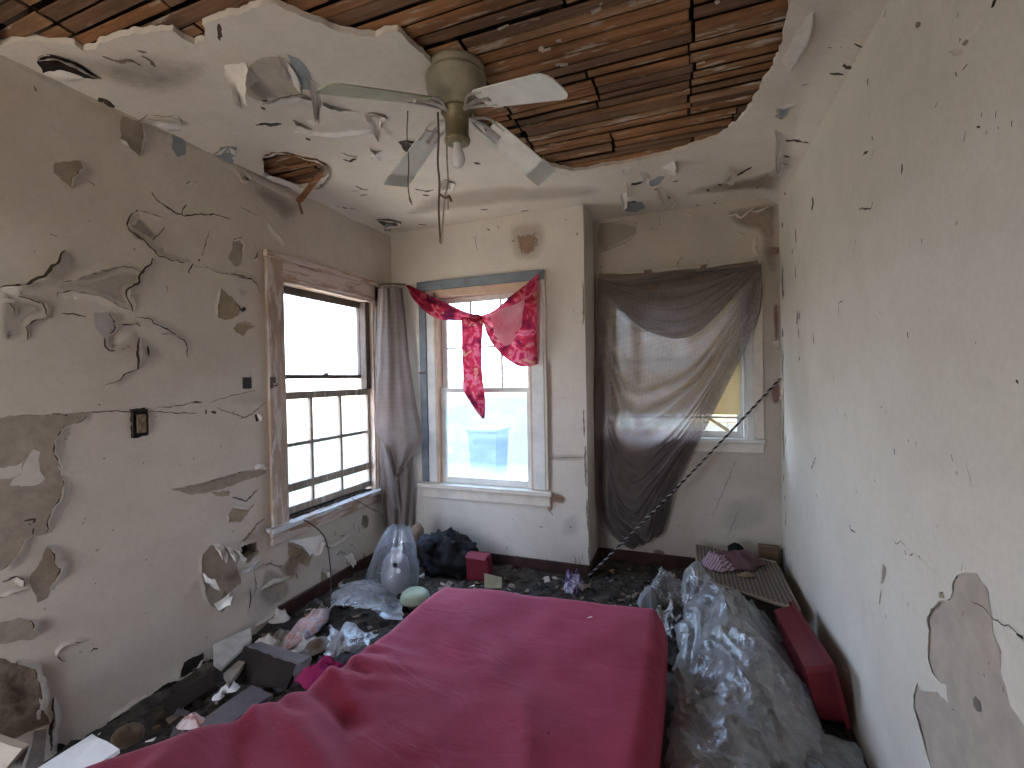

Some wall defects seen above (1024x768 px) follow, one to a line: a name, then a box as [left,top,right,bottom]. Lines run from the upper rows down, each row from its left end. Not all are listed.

flaking render [37,54,101,81]
peeling [98,97,186,157]
peeling [224,54,387,163]
crack [152,193,257,256]
damp [518,232,538,254]
peeling [0,210,263,388]
crack [36,390,266,419]
peeling [0,404,101,602]
peeling [197,519,325,611]
flaking render [0,658,66,753]
flaking render [106,653,207,725]
flaking render [913,568,1024,768]